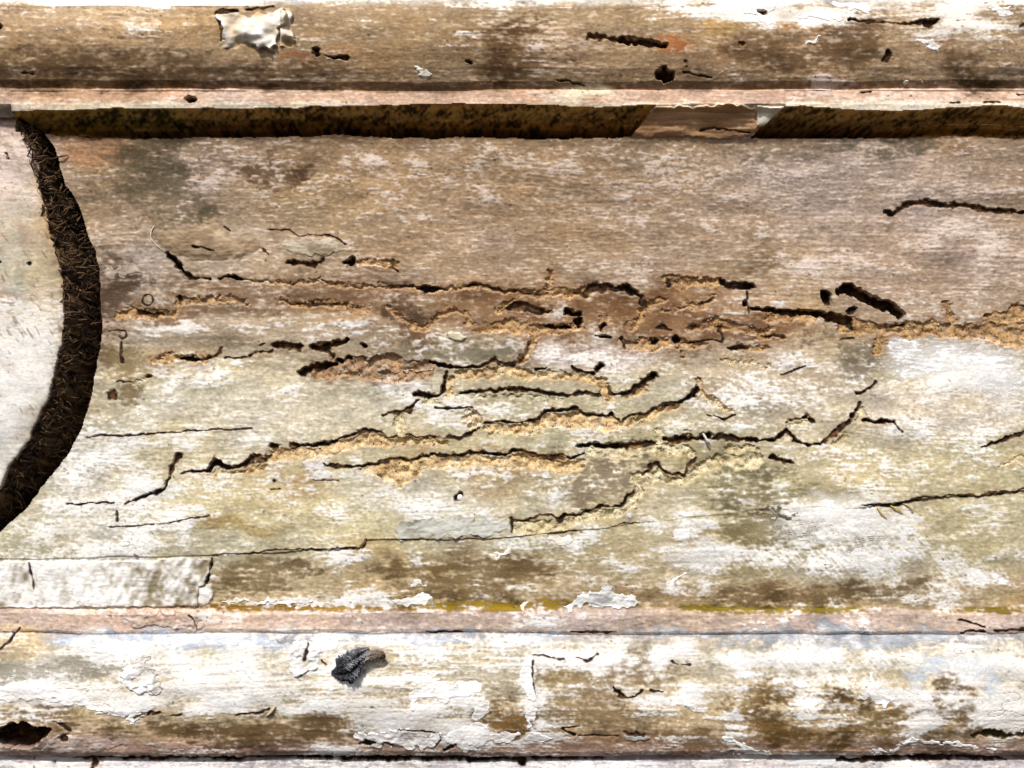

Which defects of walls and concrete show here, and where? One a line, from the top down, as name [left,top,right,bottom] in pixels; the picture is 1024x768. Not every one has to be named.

crack [883,198,1024,217]
crack [456,387,602,402]
crack [855,380,878,395]
crack [67,428,253,529]
crack [769,454,794,470]
crack [862,431,1024,508]
peeling [563,585,640,613]
spalling [288,640,323,678]
peeling [0,682,144,725]
peeling [354,655,554,753]
spalling [43,734,123,754]
peeling [872,737,997,755]